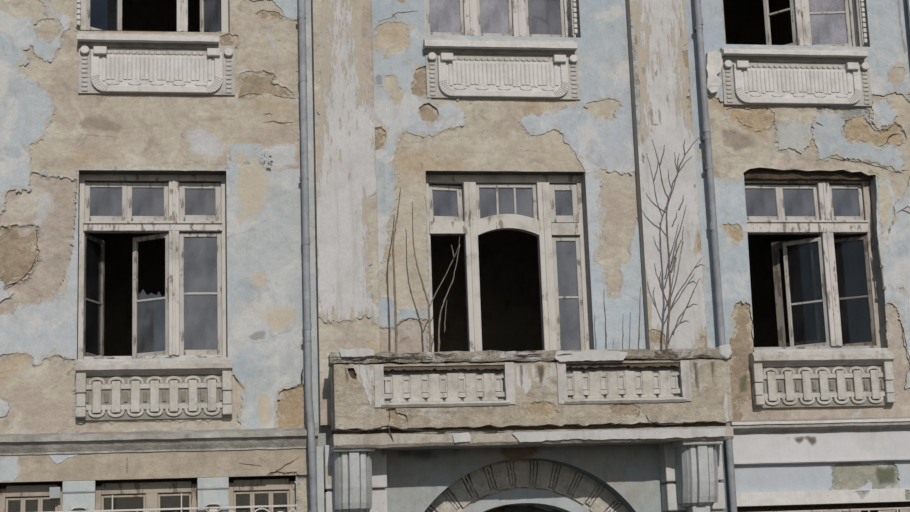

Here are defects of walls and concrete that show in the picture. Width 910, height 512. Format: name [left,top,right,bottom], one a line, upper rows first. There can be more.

peeling [680,28,693,127]
flaking render [0,0,300,315]
flaking render [597,12,668,297]
flaking render [703,67,910,236]
flaking render [319,0,622,426]
flaking render [723,223,743,245]
flaking render [0,353,244,434]
flaking render [276,381,306,428]
flaking render [608,403,641,418]
peeling [830,461,910,500]